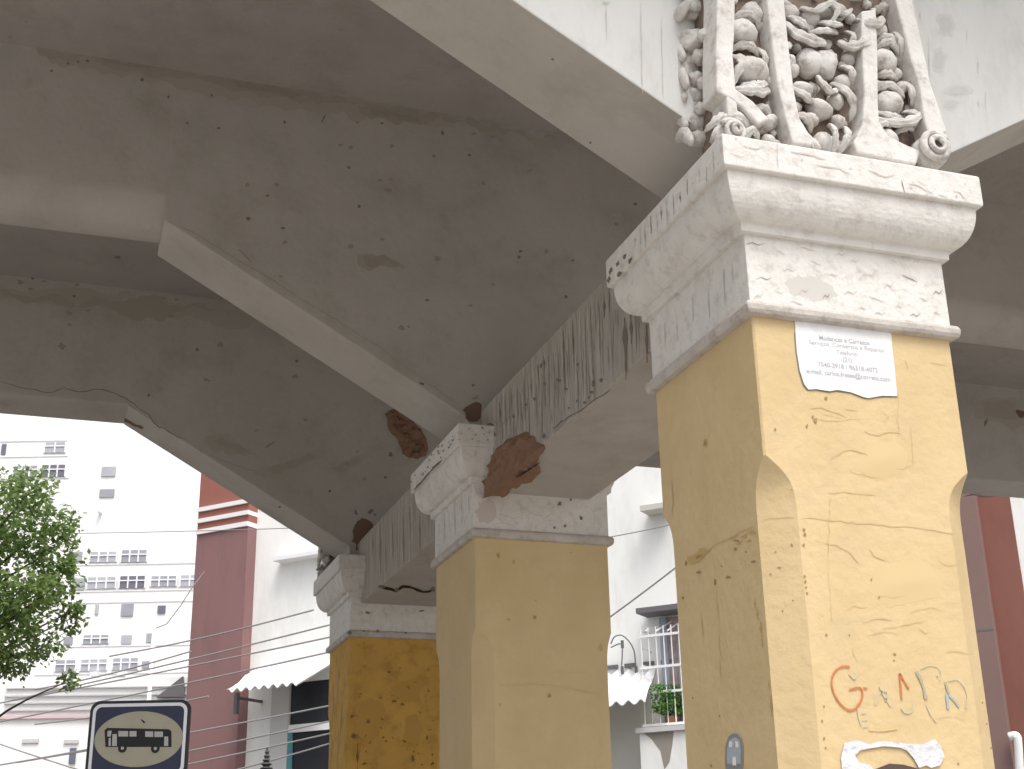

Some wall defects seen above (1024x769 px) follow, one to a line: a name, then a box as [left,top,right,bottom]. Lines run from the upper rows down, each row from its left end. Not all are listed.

crack [1,381,184,439]
spalling [386,409,429,459]
spalling [481,432,545,498]
crack [708,392,970,660]
crack [382,585,432,593]